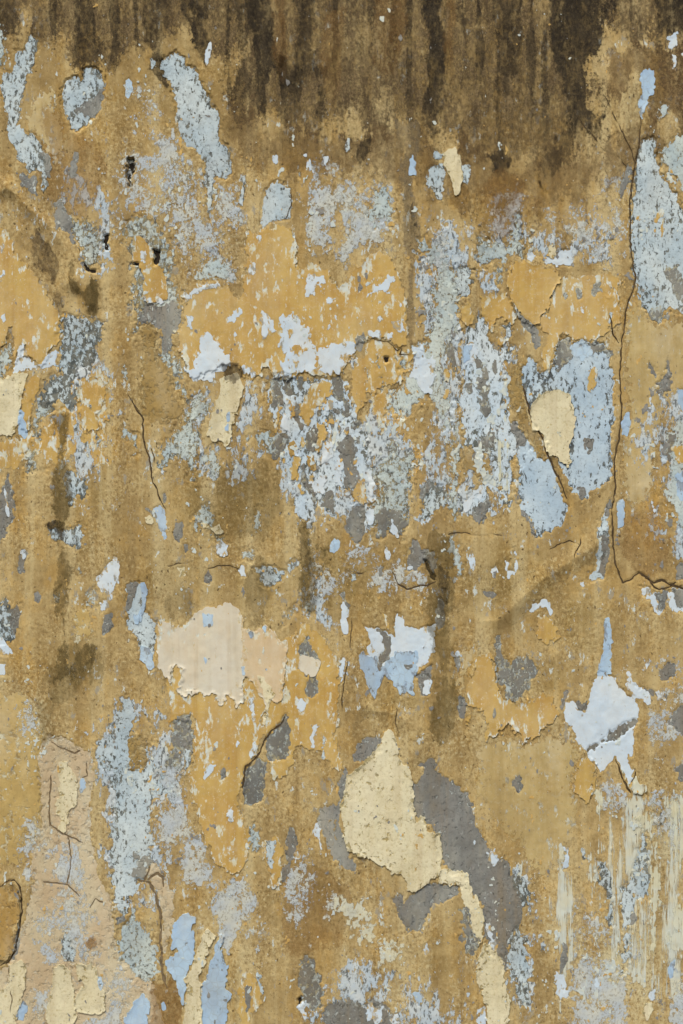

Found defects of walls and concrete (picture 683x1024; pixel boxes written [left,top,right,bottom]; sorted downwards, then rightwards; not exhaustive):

leakage [0,0,683,173]
crack [125,387,166,509]
peeling [0,29,683,702]
crack [577,97,683,590]
peeling [560,617,676,784]
crack [0,879,23,1008]
peeling [0,696,195,1024]
peeling [313,737,381,871]